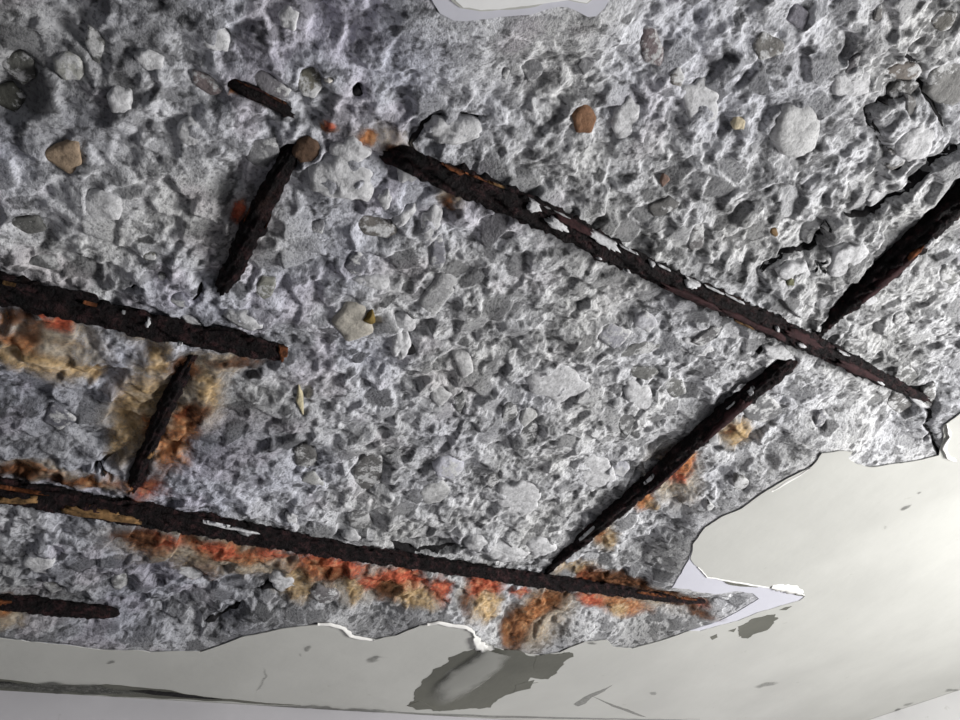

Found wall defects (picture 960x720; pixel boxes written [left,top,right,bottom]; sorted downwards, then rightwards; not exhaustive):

spalling [424,114,482,145]
crack [760,54,958,274]
spalling [895,124,935,162]
rust [0,309,102,378]
spalling [0,270,288,363]
spalling [378,145,933,405]
rust [0,337,258,496]
rust [637,454,696,510]
spalling [544,359,798,574]
spalling [0,476,706,652]
rust [286,554,452,608]
rust [461,563,711,650]